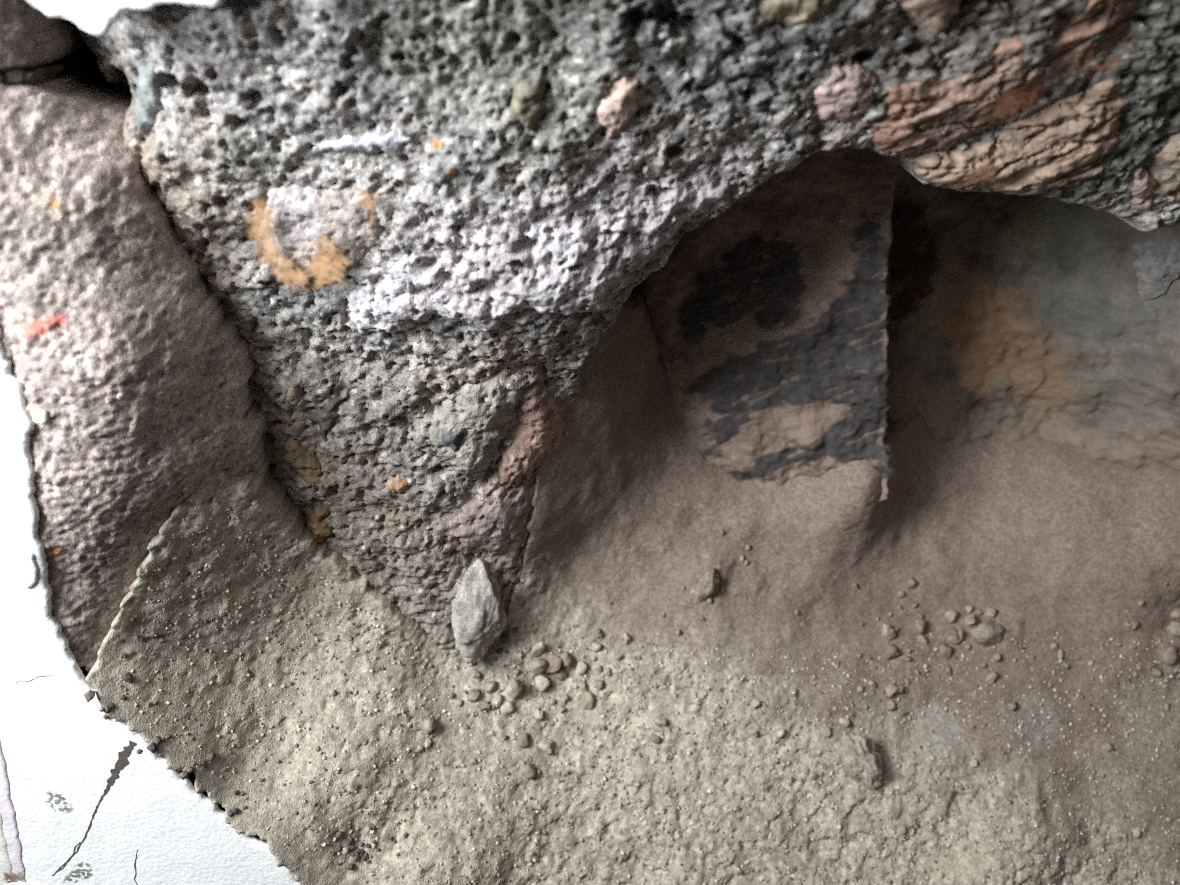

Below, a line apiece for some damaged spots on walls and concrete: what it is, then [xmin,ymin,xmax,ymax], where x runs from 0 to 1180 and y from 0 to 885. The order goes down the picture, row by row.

corrosion [248,201,349,290]
spalling [0,0,1180,673]
damp [689,215,891,480]
peeling [0,742,32,885]
crack [52,740,137,876]